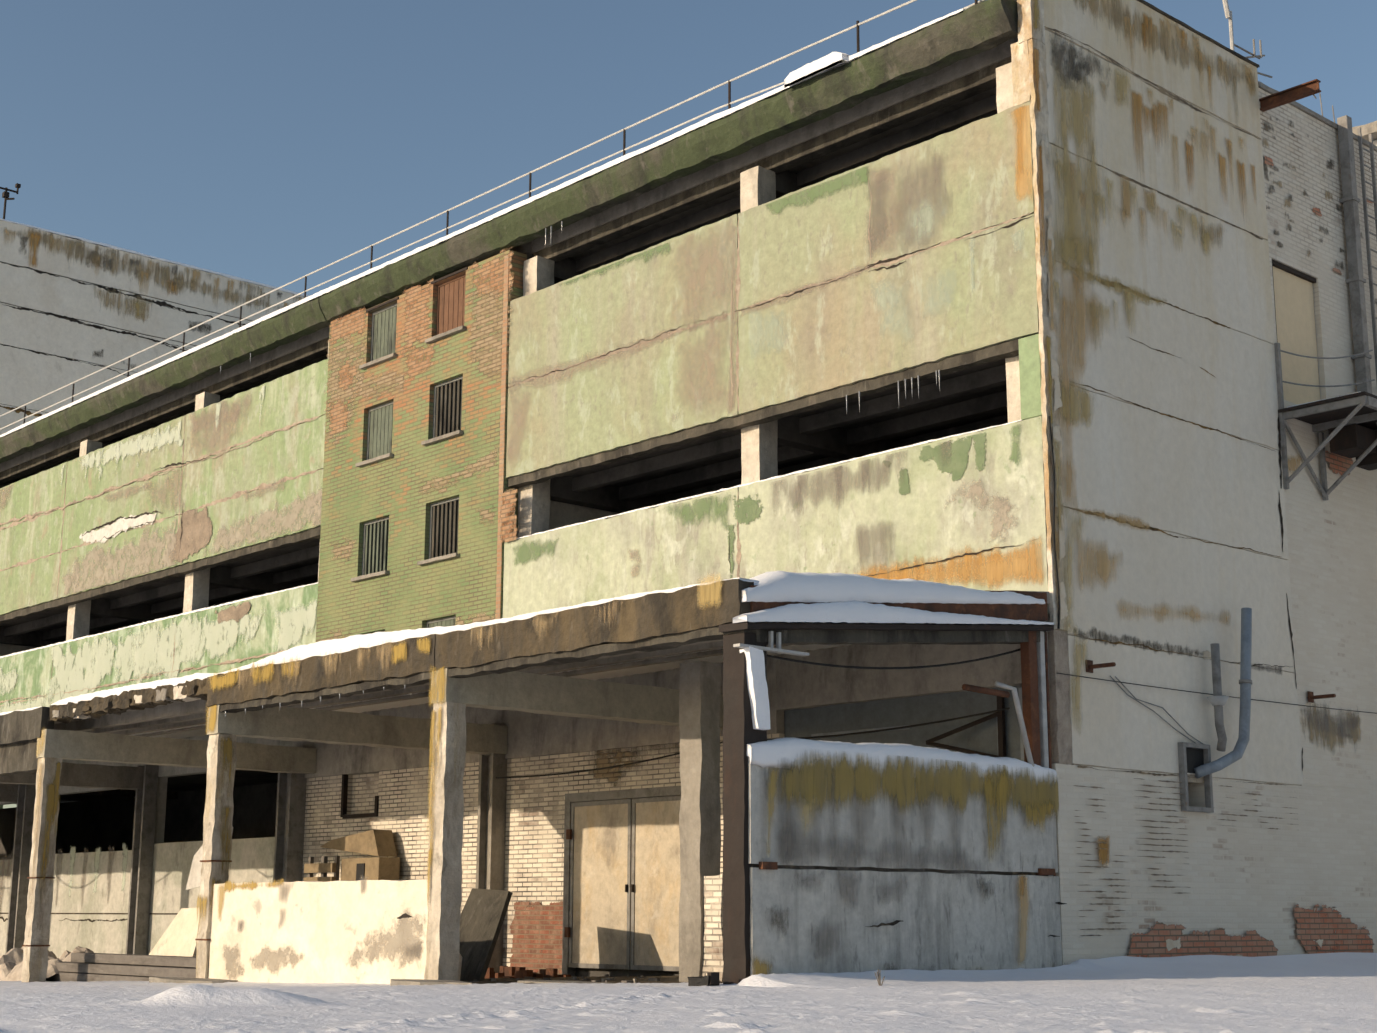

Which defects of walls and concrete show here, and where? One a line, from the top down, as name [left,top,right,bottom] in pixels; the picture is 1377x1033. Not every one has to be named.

corrosion [1075,0,1254,92]
corrosion [1132,91,1173,143]
crack [0,261,246,325]
crack [864,246,933,271]
crack [1,305,189,376]
crack [1068,381,1284,557]
spalling [63,490,322,595]
corrosion [861,442,1114,610]
spalling [48,631,209,724]
damp [768,755,1059,905]
flaking render [1127,921,1278,957]
flaking render [1294,904,1374,954]